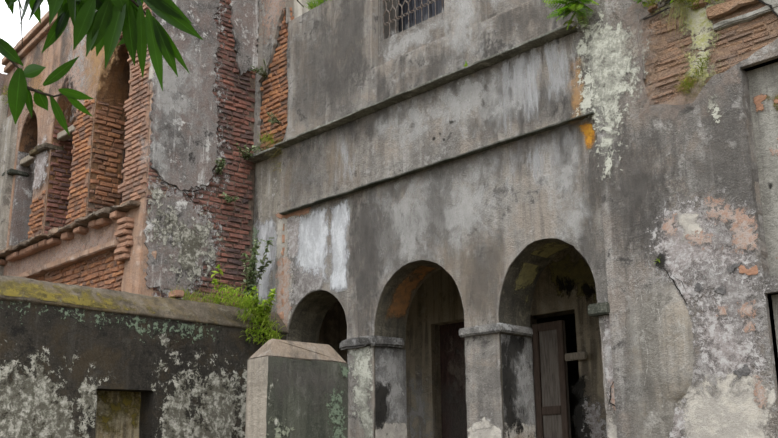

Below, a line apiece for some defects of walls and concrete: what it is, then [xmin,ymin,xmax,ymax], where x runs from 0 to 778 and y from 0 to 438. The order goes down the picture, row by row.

flaking render [258,0,294,151]
damp [388,0,473,92]
damp [342,43,584,192]
spalling [611,0,778,105]
damp [349,169,493,335]
crack [662,267,687,304]
peeling [642,187,778,438]